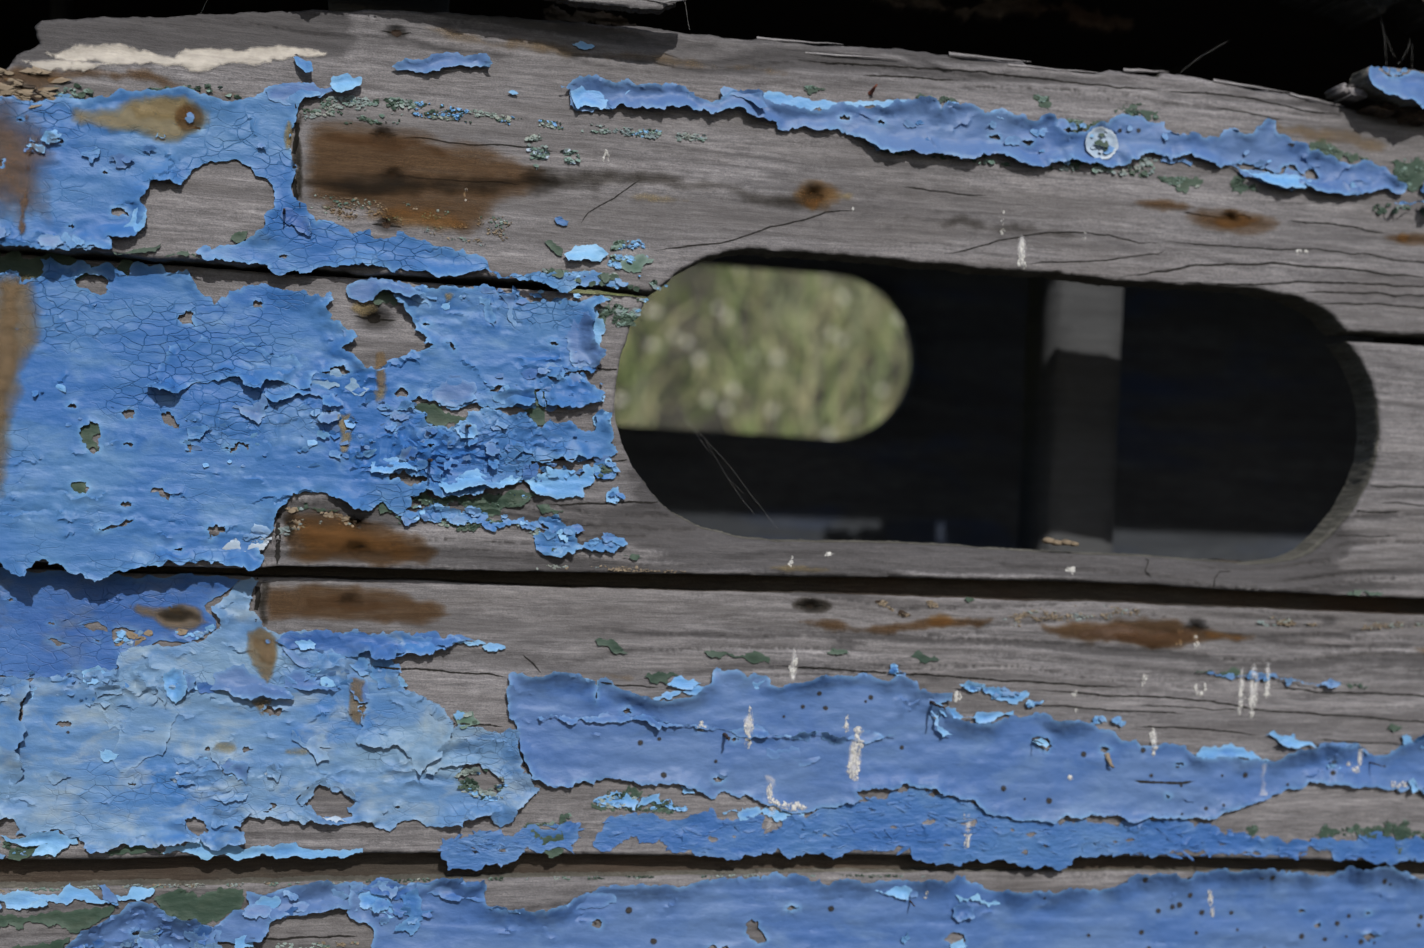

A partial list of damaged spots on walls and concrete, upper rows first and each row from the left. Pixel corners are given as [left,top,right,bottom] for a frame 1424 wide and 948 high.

corrosion [286,119,301,195]
peeling [293,56,313,73]
peeling [0,73,654,293]
peeling [561,74,1424,216]
peeling [1368,66,1424,109]
peeling [0,250,1424,948]